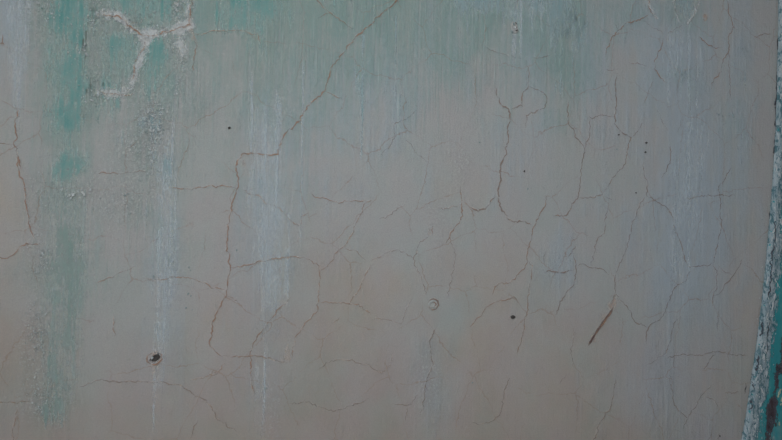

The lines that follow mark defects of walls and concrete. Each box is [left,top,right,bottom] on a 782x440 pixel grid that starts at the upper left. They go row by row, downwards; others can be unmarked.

crack [0,110,38,259]
crack [96,0,259,105]
crack [162,0,404,428]
crack [432,70,776,410]
peeling [739,0,782,440]